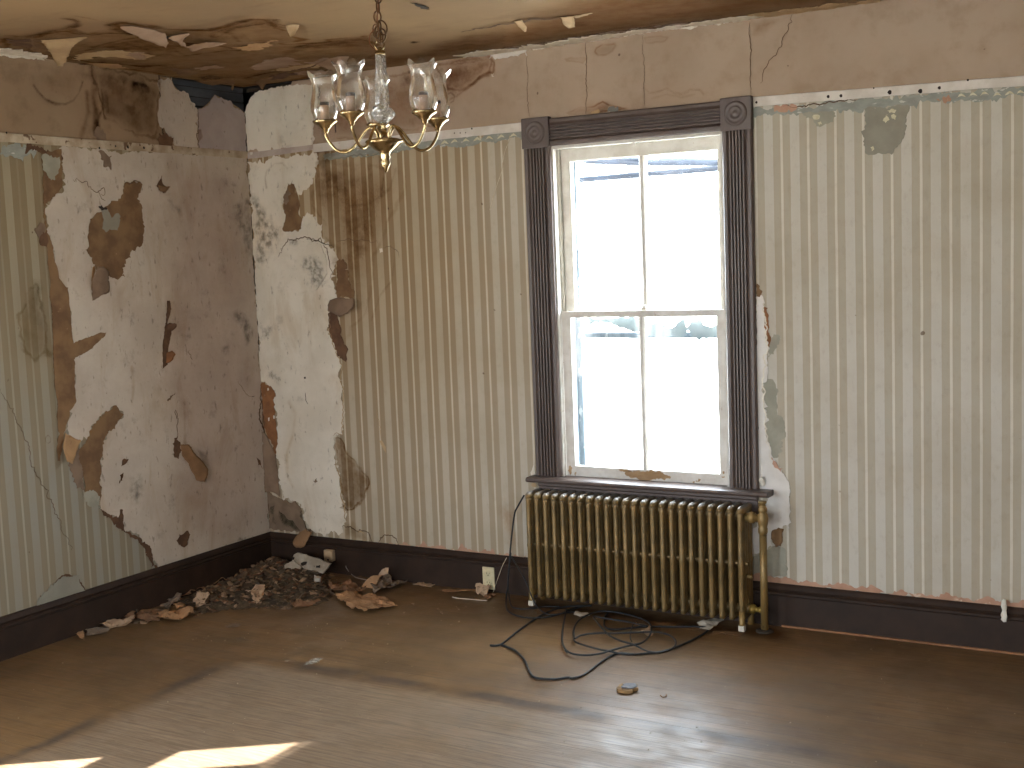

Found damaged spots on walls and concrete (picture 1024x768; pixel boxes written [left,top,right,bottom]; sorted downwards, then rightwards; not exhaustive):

peeling [0,37,87,66]
crack [748,14,793,88]
flaking render [34,26,386,567]
crack [245,117,333,351]
crack [0,389,72,550]
peeling [619,469,671,481]
flaking render [752,284,791,577]